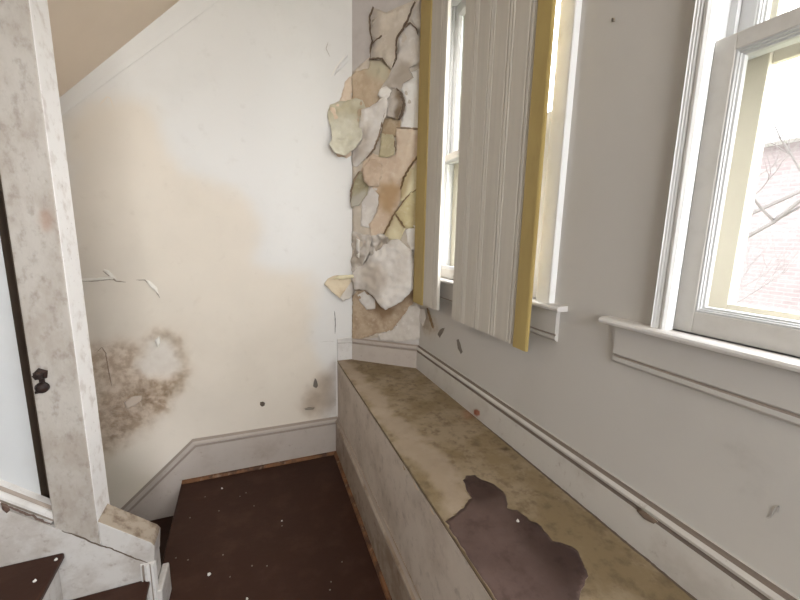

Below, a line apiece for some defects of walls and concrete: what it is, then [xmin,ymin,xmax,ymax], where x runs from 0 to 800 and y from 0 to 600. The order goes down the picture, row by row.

peeling [324,0,445,342]
peeling [445,475,588,600]